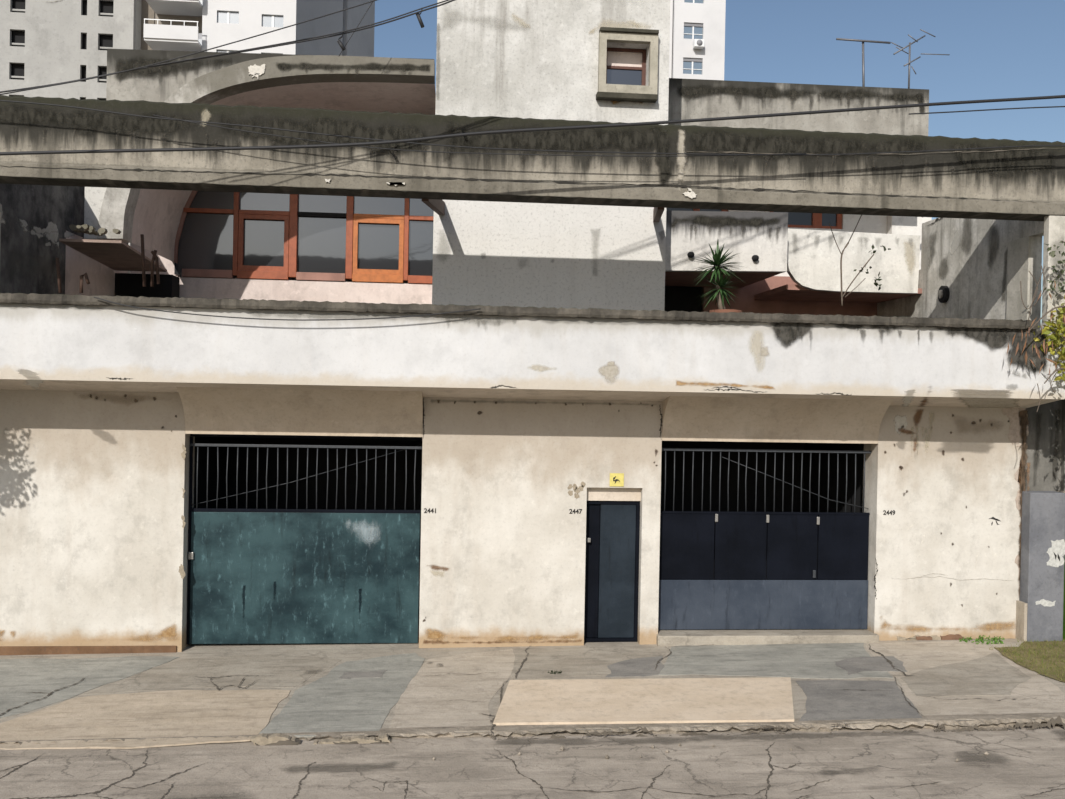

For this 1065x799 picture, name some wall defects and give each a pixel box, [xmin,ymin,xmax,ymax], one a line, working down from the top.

damp [678,86,924,113]
damp [0,105,189,140]
damp [222,118,426,160]
damp [447,125,925,190]
damp [952,144,1055,179]
damp [773,322,812,347]
damp [836,324,901,335]
damp [937,327,1047,372]
rust [898,390,927,450]
damp [138,627,176,641]
crack [490,726,793,740]